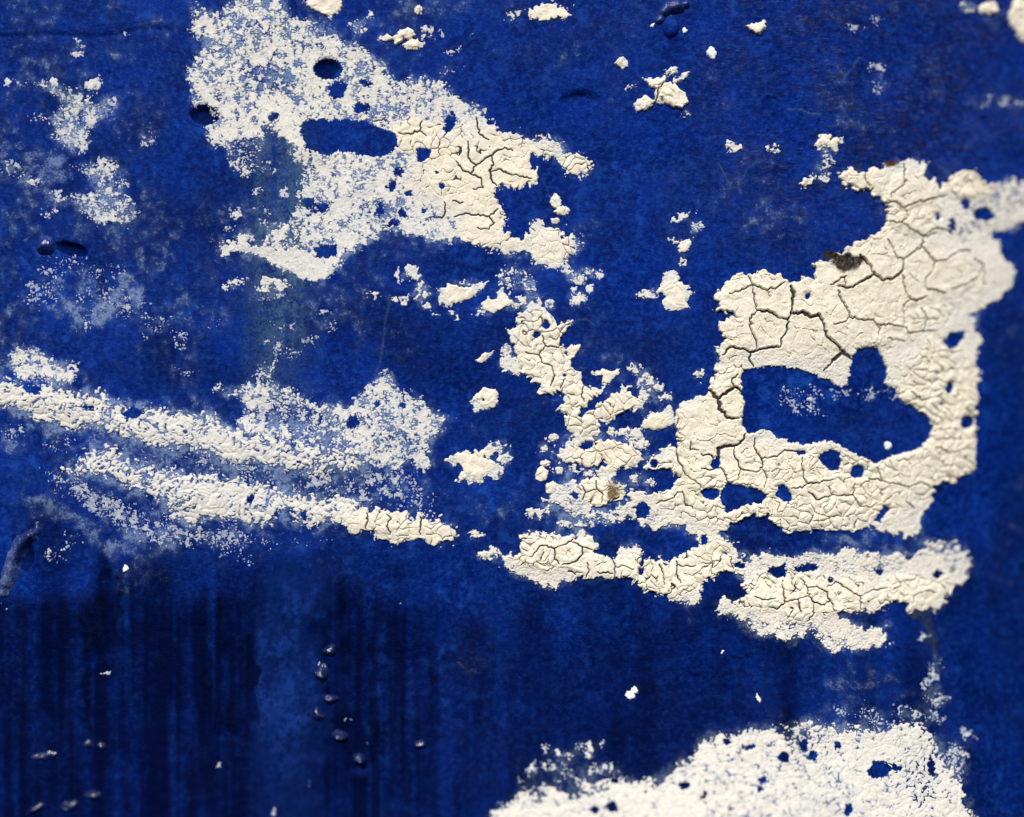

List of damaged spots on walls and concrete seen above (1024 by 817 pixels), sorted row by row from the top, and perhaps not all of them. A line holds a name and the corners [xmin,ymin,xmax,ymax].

crack [374,117,427,136]
crack [434,117,532,230]
crack [526,336,585,402]
peeling [185,0,1024,654]
crack [656,165,985,509]
peeling [0,309,486,566]
crack [532,539,633,579]
crack [659,561,694,585]
crack [754,579,887,622]
peeling [490,656,979,817]